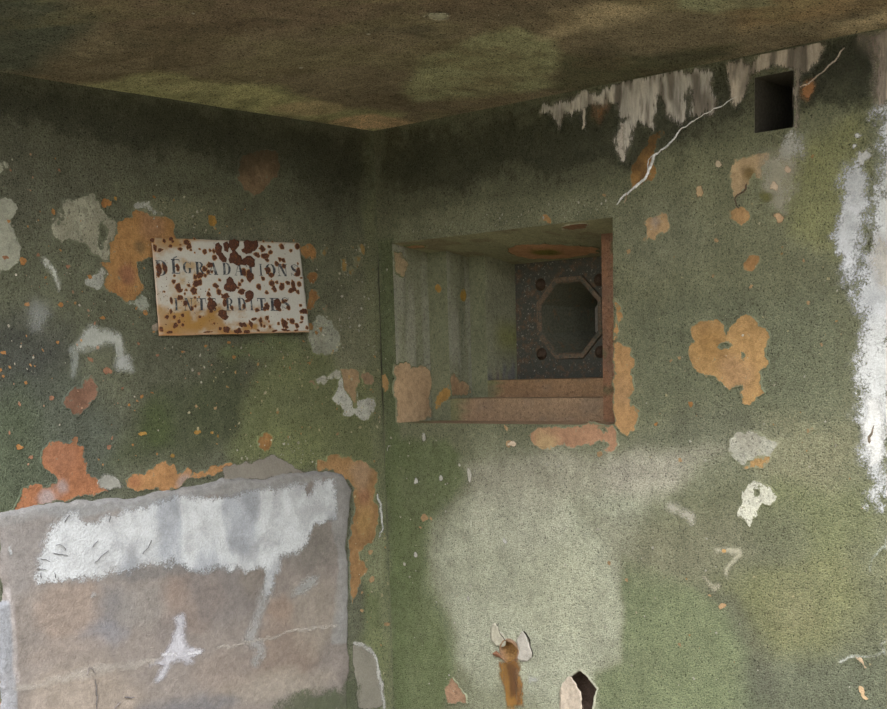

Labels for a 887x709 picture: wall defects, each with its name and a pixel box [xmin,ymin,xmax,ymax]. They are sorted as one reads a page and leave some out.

crack [800,47,845,87]
leakage [541,68,716,162]
crack [616,98,733,205]
peeling [50,191,177,315]
leakage [727,29,887,511]
peeling [528,297,641,457]
peeling [669,313,771,406]
peeling [11,431,305,510]
flaking render [737,480,779,528]
leakage [34,478,338,665]
leakage [155,615,201,681]
corrosion [499,659,523,709]